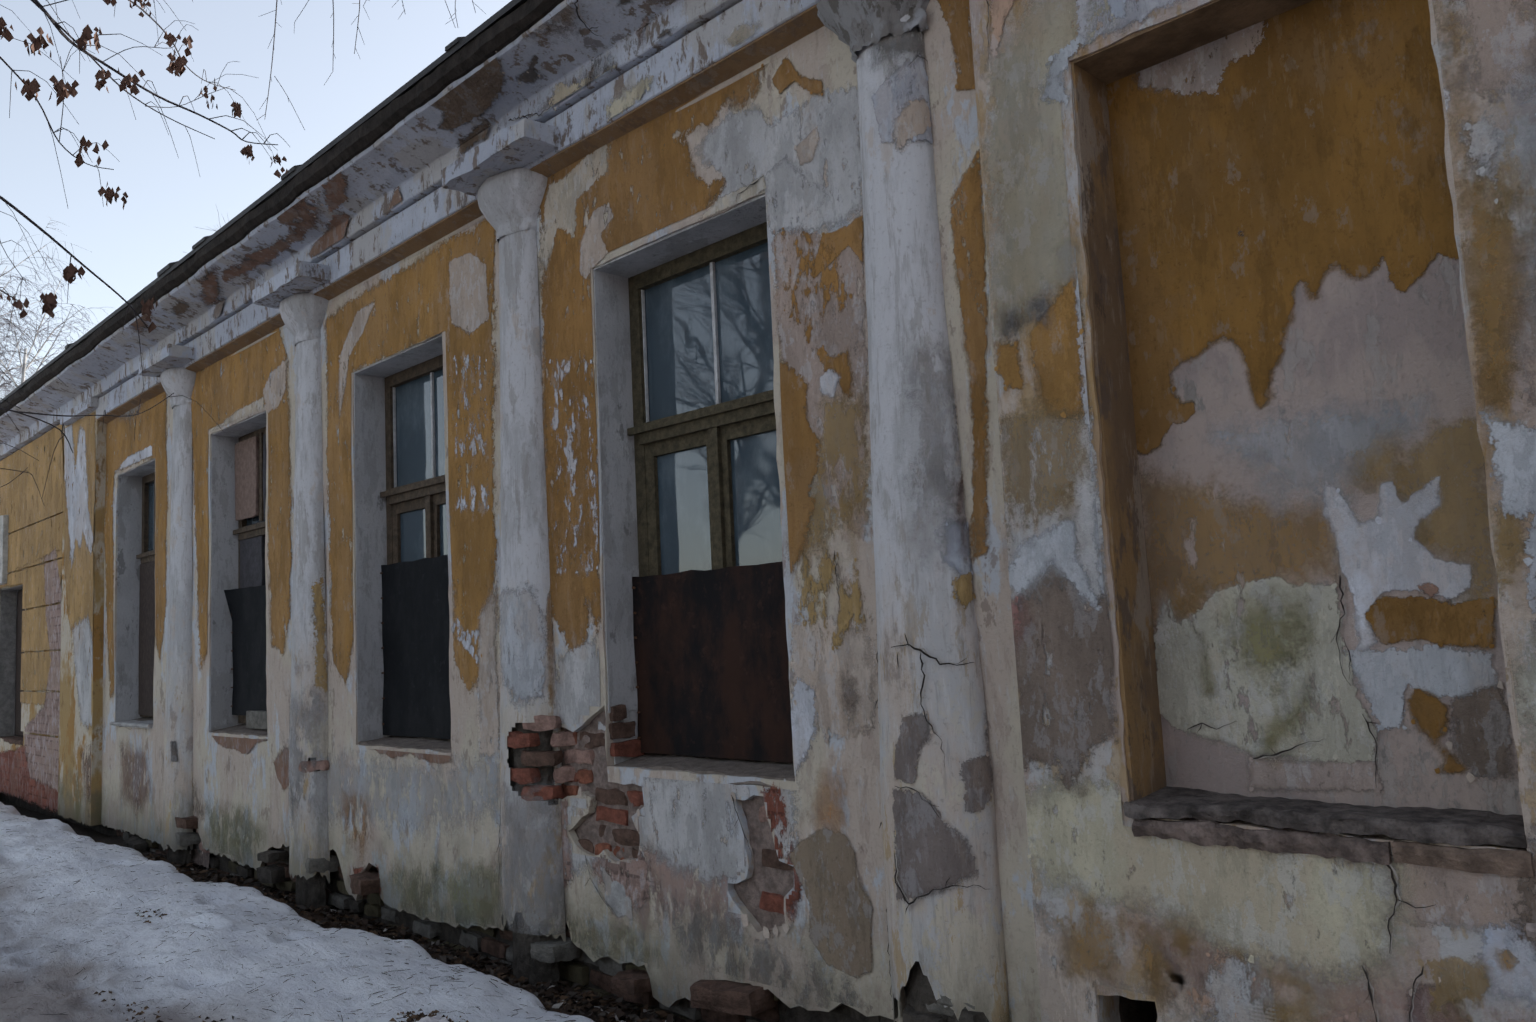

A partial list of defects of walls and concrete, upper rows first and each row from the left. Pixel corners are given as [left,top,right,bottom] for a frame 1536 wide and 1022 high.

peeling [937,0,1013,91]
peeling [1041,0,1179,108]
flaking render [129,170,350,334]
peeling [1106,0,1536,455]
peeling [0,392,169,812]
peeling [191,328,292,669]
peeling [311,51,933,978]
crack [875,634,974,818]
peeling [892,711,978,902]
peeling [943,149,1536,1022]
damp [1232,604,1306,668]
crack [1361,854,1434,1022]